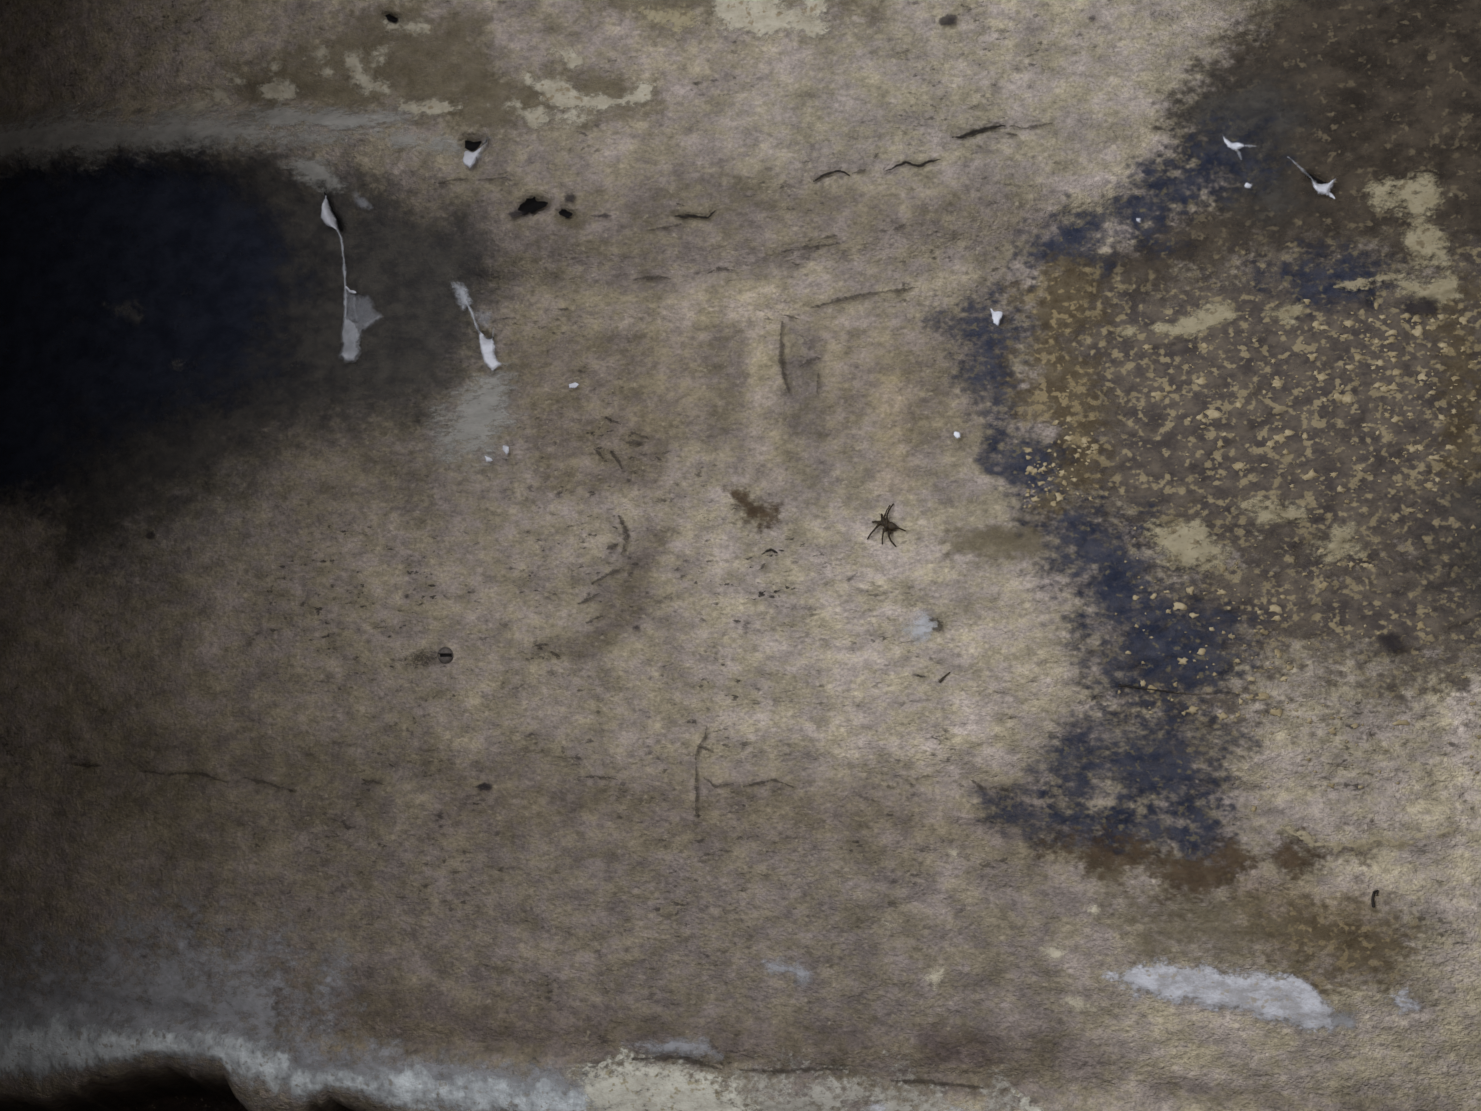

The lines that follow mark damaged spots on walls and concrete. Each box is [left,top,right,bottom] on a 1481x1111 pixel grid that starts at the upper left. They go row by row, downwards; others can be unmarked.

water stain [0,4,661,561]
water stain [922,0,1481,861]
water stain [0,909,1041,1111]